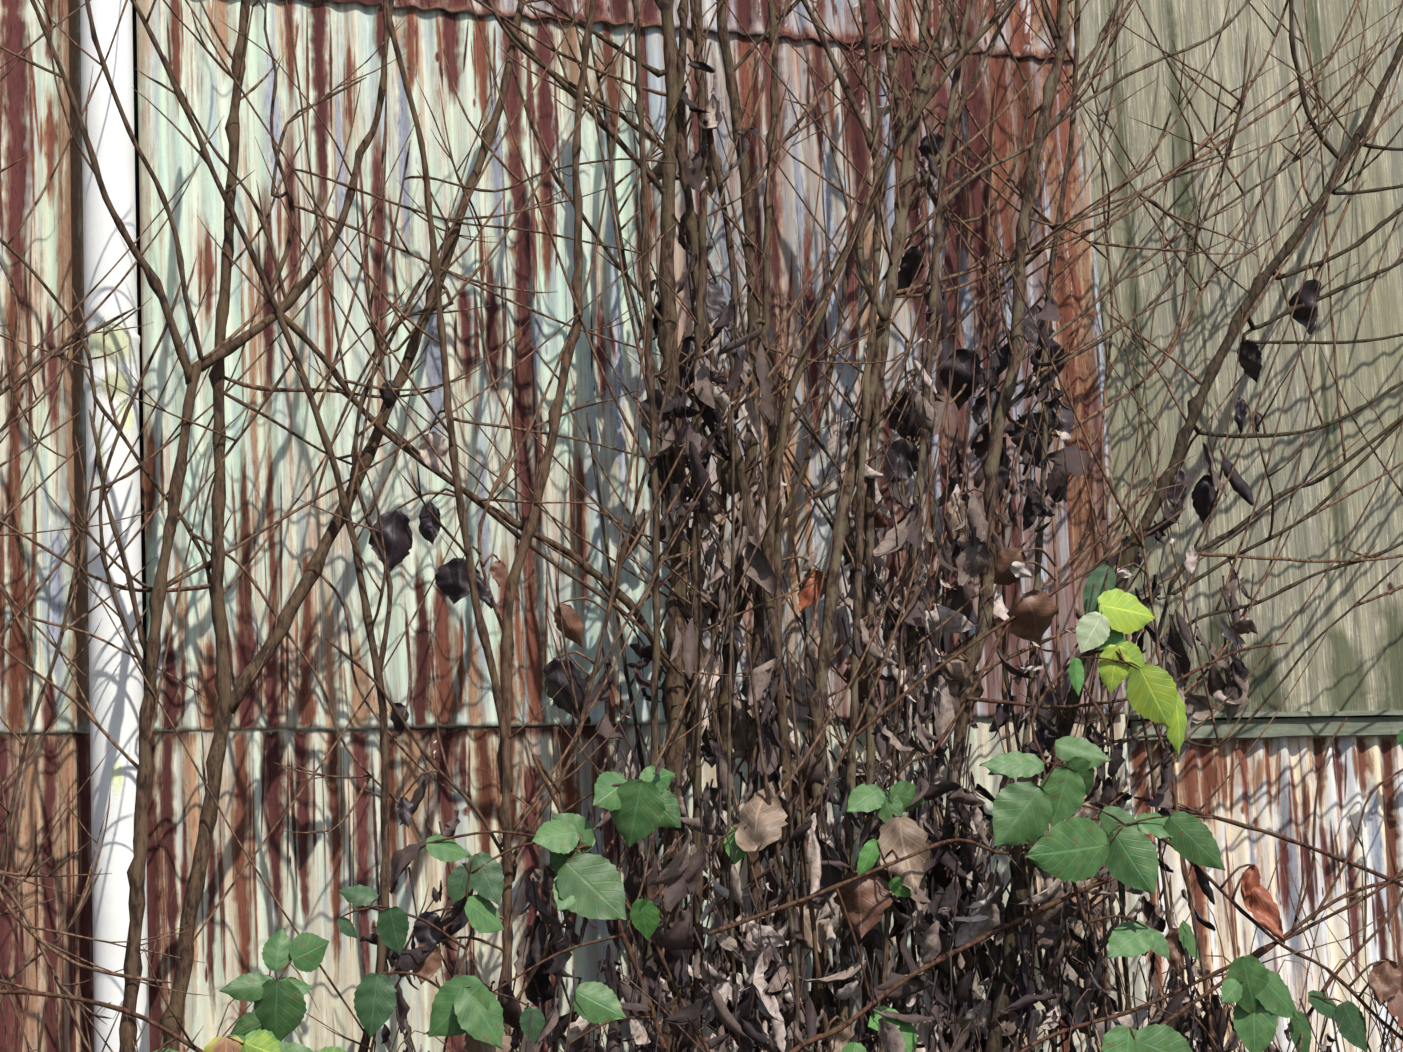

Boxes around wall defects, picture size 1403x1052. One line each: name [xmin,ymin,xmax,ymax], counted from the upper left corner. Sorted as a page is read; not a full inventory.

rust [0,0,94,1052]
rust [143,0,660,1052]
rust [684,57,709,158]
rust [1129,736,1403,996]